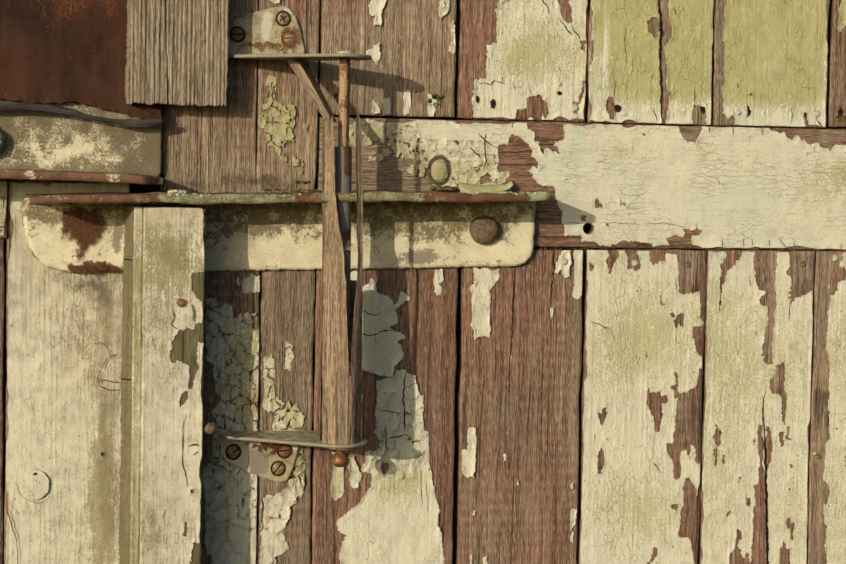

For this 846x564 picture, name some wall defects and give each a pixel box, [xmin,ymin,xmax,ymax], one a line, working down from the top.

peeling [368,0,387,26]
peeling [439,0,456,55]
peeling [646,0,672,124]
peeling [679,0,735,143]
peeling [769,116,846,150]
corrosion [61,207,123,276]
peeling [458,95,706,564]
peeling [170,272,306,564]
peeling [331,269,445,564]
peeling [730,251,791,564]
peeling [787,251,846,564]
peeling [779,518,795,564]